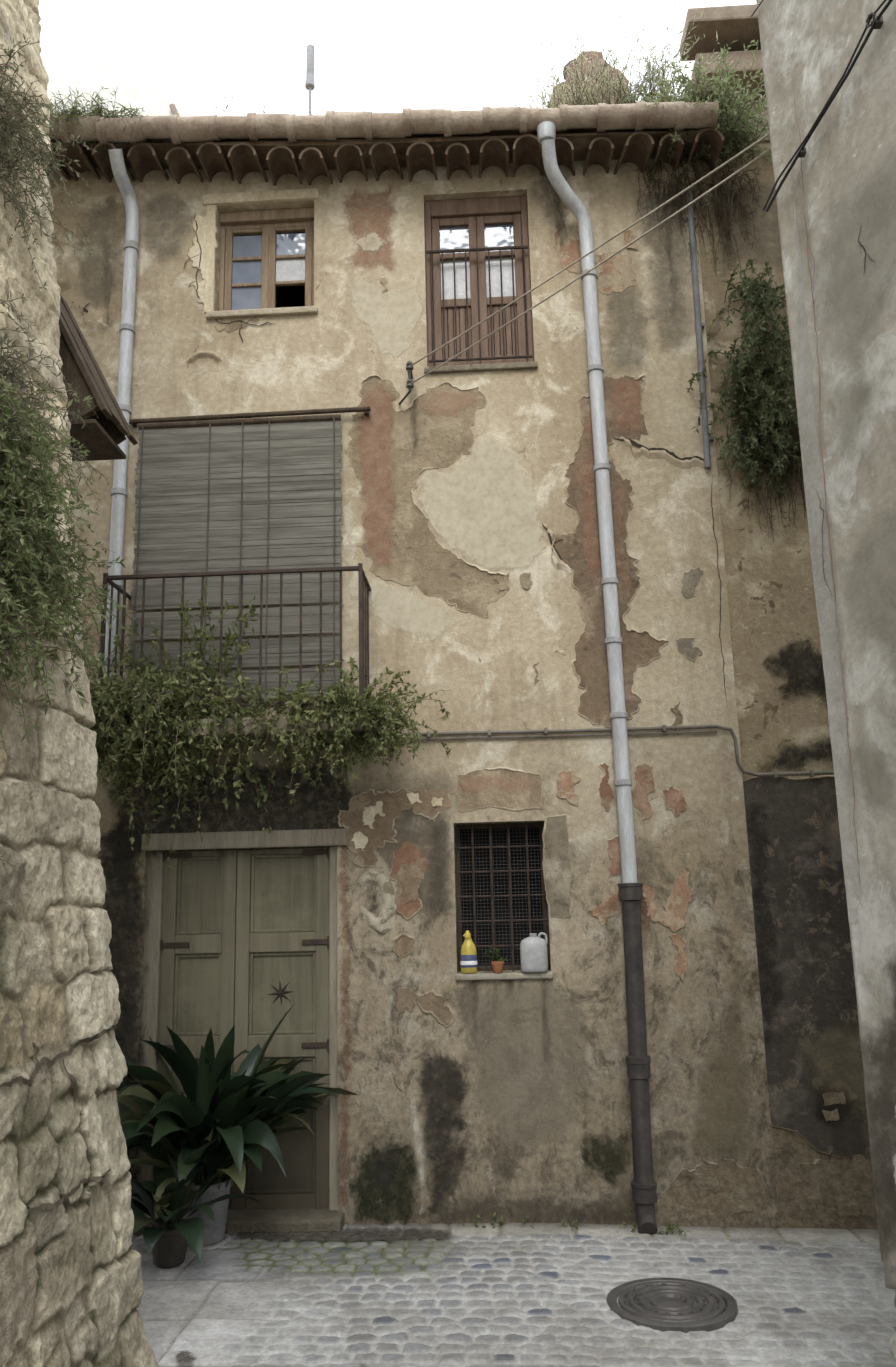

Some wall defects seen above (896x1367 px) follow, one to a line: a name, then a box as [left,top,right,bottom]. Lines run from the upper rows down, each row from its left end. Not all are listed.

crack [184,215,276,342]
flaking render [346,189,394,293]
flaking render [345,374,533,619]
flaking render [550,374,704,728]
crack [613,436,728,708]
flaking render [337,766,581,959]
flaking render [589,835,621,926]
flaking render [598,762,688,821]
leakage [853,881,896,1000]
leakage [412,1055,627,1225]
flaking render [656,1154,878,1230]
leakage [862,1024,896,1240]